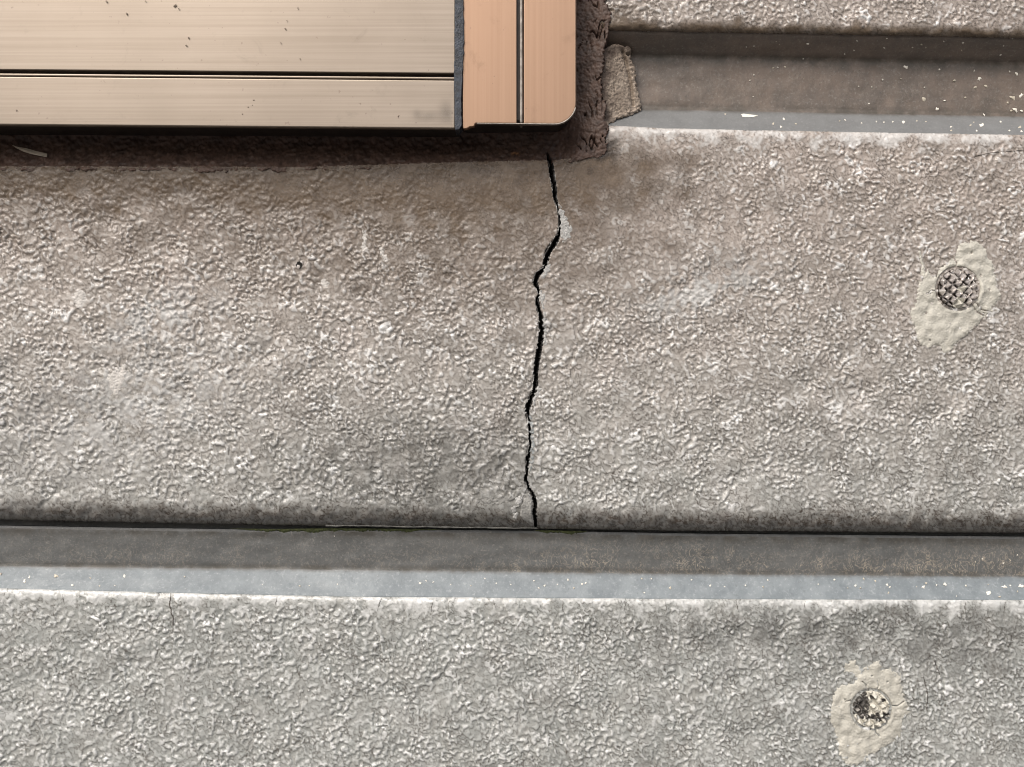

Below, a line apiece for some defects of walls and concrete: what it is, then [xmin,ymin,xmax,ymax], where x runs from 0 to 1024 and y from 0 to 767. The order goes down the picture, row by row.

crack [516,153,573,528]